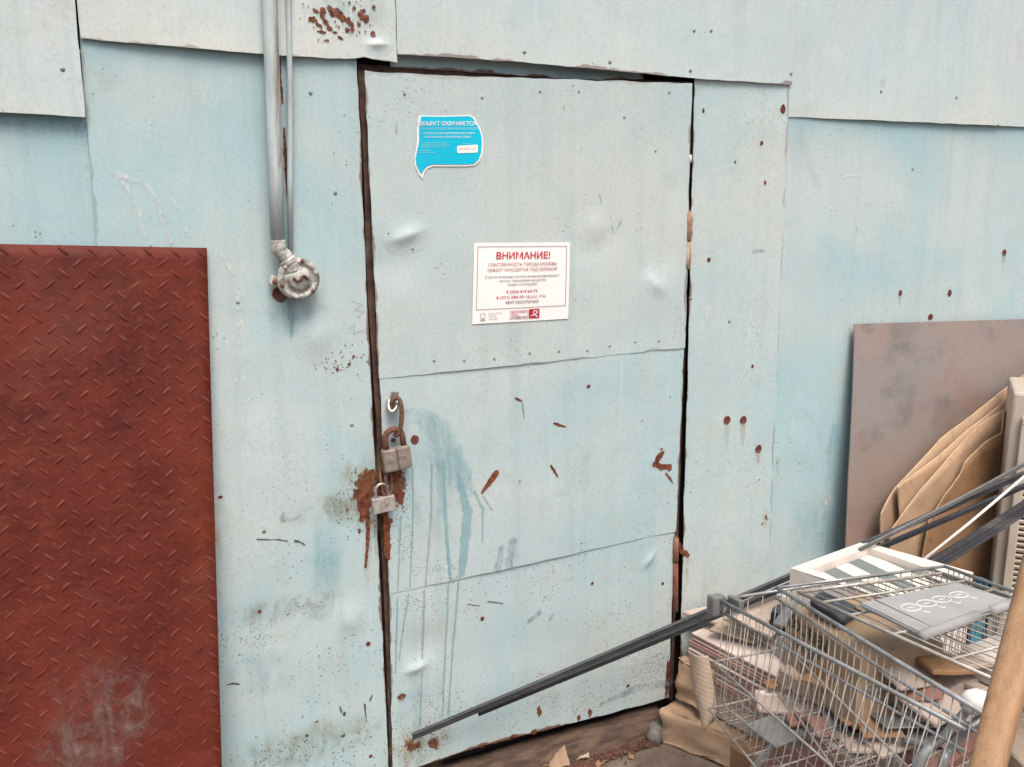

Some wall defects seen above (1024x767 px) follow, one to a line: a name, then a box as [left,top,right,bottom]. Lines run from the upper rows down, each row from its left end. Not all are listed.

rust [300,1,376,41]
rust [652,448,673,483]
rust [333,469,410,568]
rust [394,718,448,763]